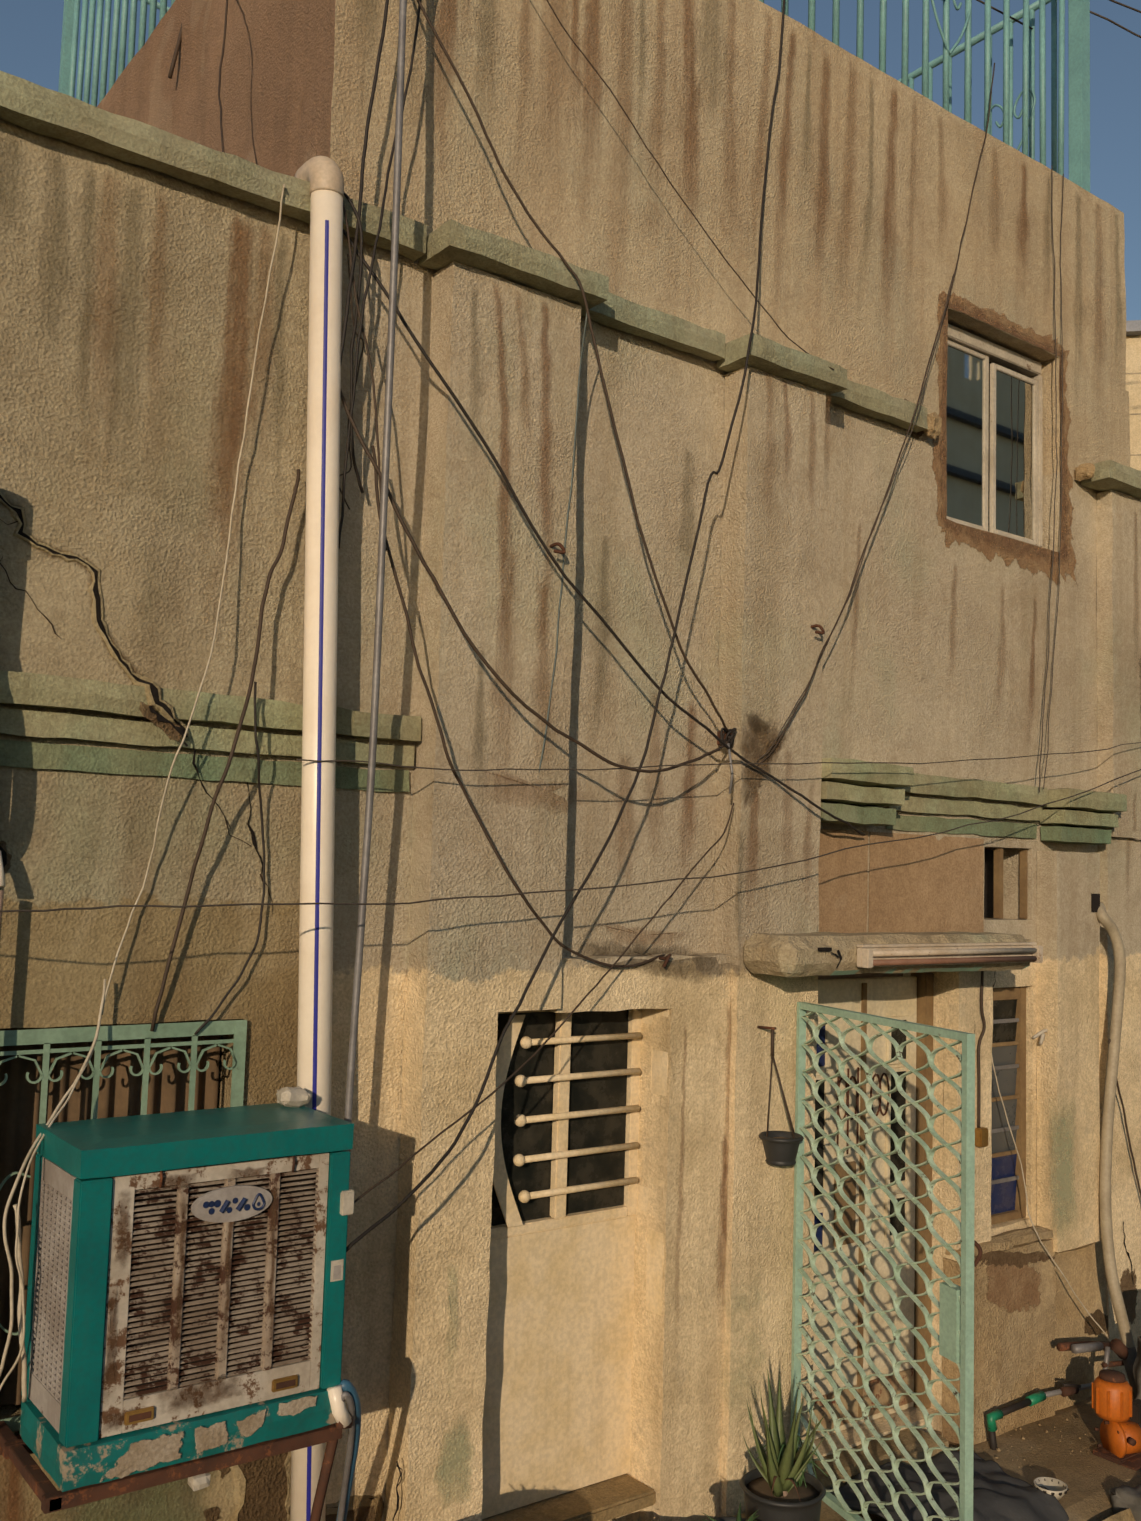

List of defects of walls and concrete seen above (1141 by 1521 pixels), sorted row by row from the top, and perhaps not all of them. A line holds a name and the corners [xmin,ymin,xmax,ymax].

peeling [906,291,1095,585]
crack [0,491,273,917]
spalling [974,1251,1055,1313]
peeling [203,1451,291,1521]